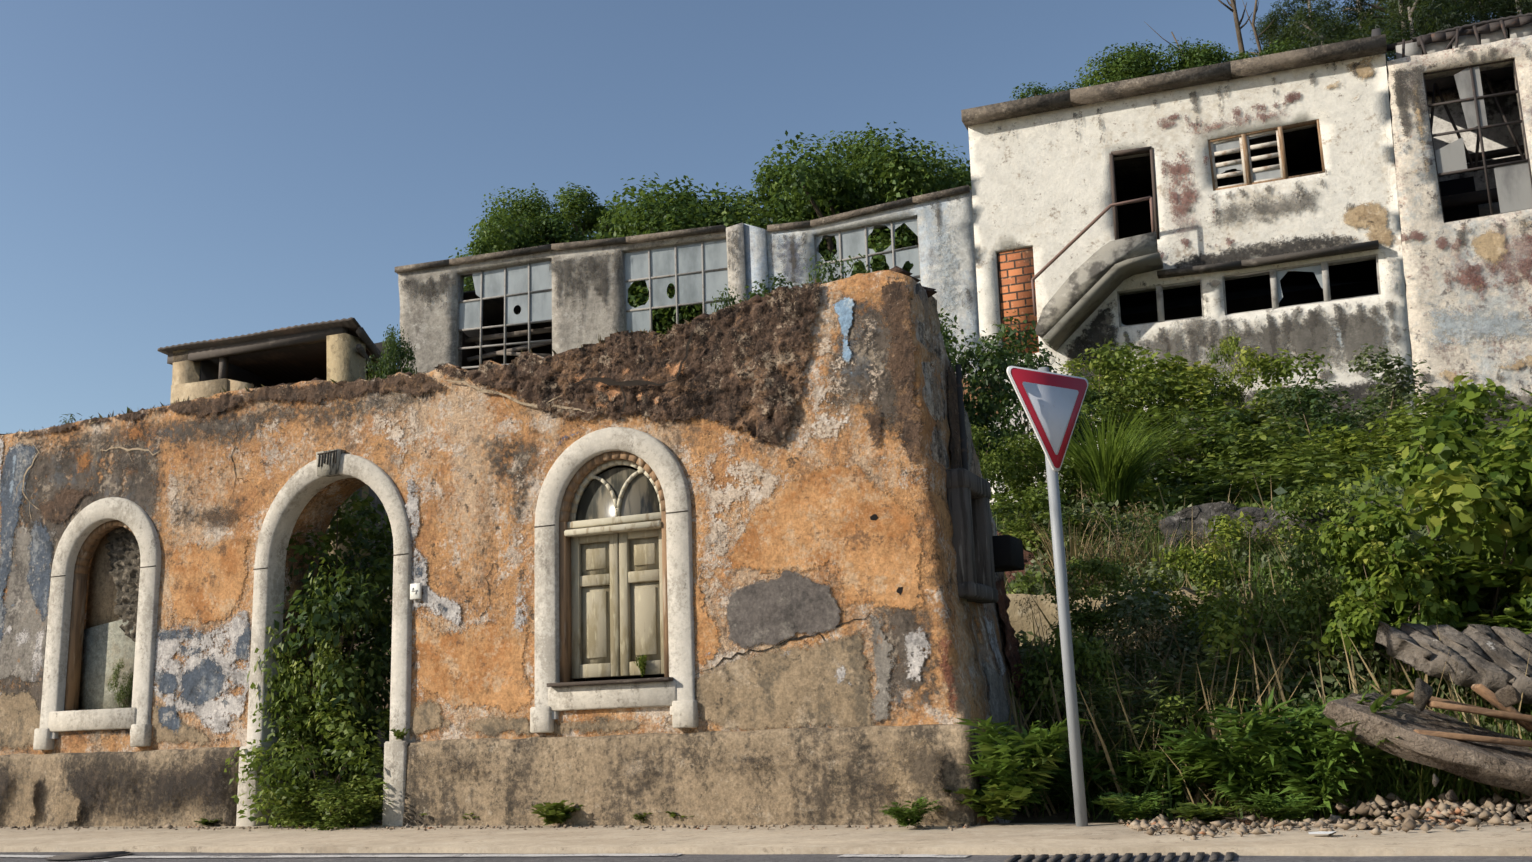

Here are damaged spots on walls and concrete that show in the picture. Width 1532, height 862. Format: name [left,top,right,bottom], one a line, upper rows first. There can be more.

spalling [1343,200,1394,246]
spalling [1471,229,1508,265]
water stain [1496,217,1532,238]
water stain [1048,170,1476,465]
water stain [1465,367,1532,431]
spalling [0,280,1036,753]
crack [696,614,870,675]
peeling [15,768,81,826]
water stain [62,754,223,816]